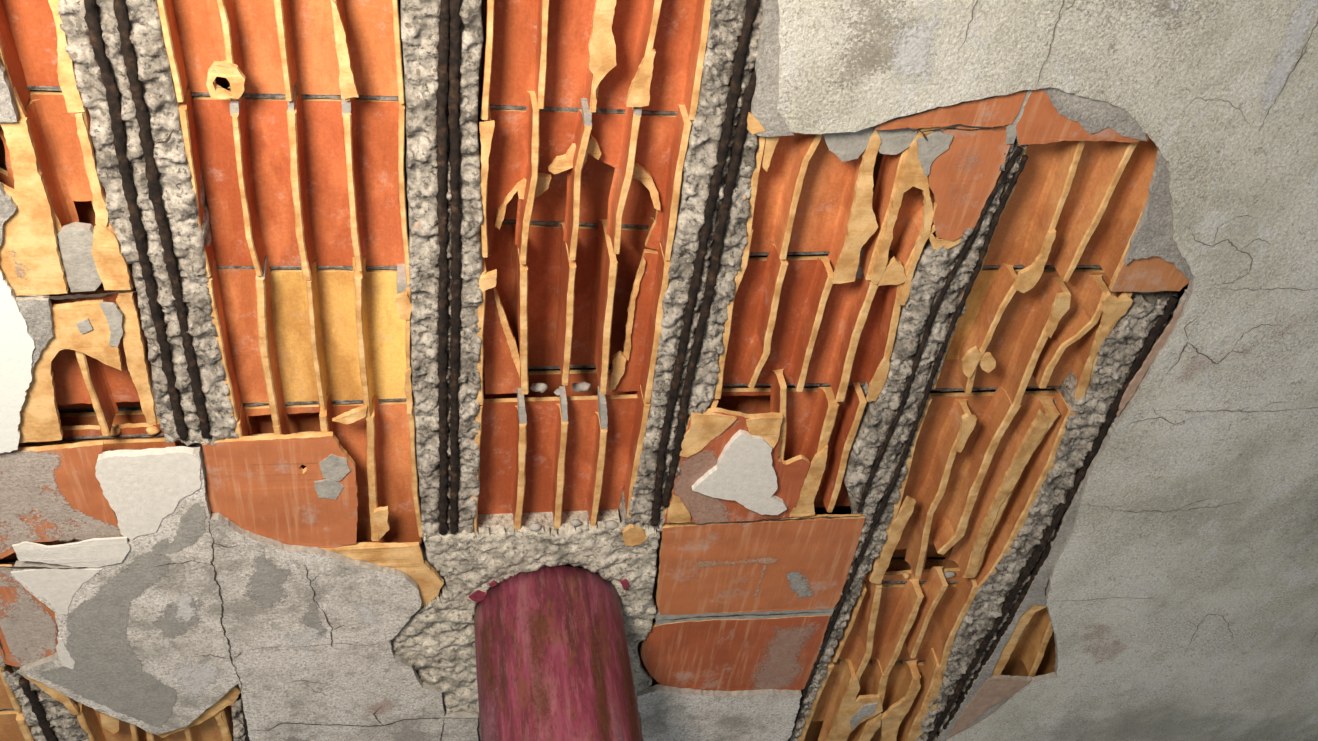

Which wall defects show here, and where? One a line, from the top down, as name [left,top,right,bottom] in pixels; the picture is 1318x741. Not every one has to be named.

spalling [58,0,241,446]
rust [120,107,189,329]
spalling [391,0,794,741]
rust [819,142,1023,663]
spalling [788,87,1194,741]
crack [1089,498,1250,513]
crack [1122,402,1318,430]
crack [1166,215,1318,374]
peeling [1,503,219,741]
spalling [229,697,250,741]
crack [156,521,473,739]
crack [1184,614,1234,656]